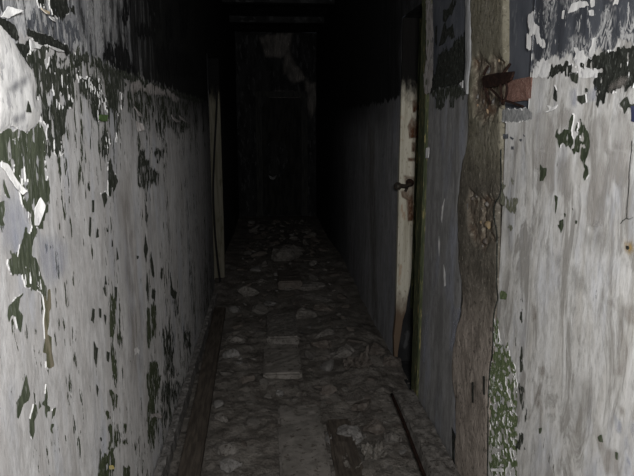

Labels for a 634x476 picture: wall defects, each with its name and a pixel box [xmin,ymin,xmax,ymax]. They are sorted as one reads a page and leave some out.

peeling [424,0,465,110]
peeling [526,11,545,50]
peeling [562,0,595,19]
peeling [532,37,634,122]
peeling [0,0,204,370]
peeling [555,113,590,180]
peeling [91,275,128,476]
peeling [137,234,180,453]